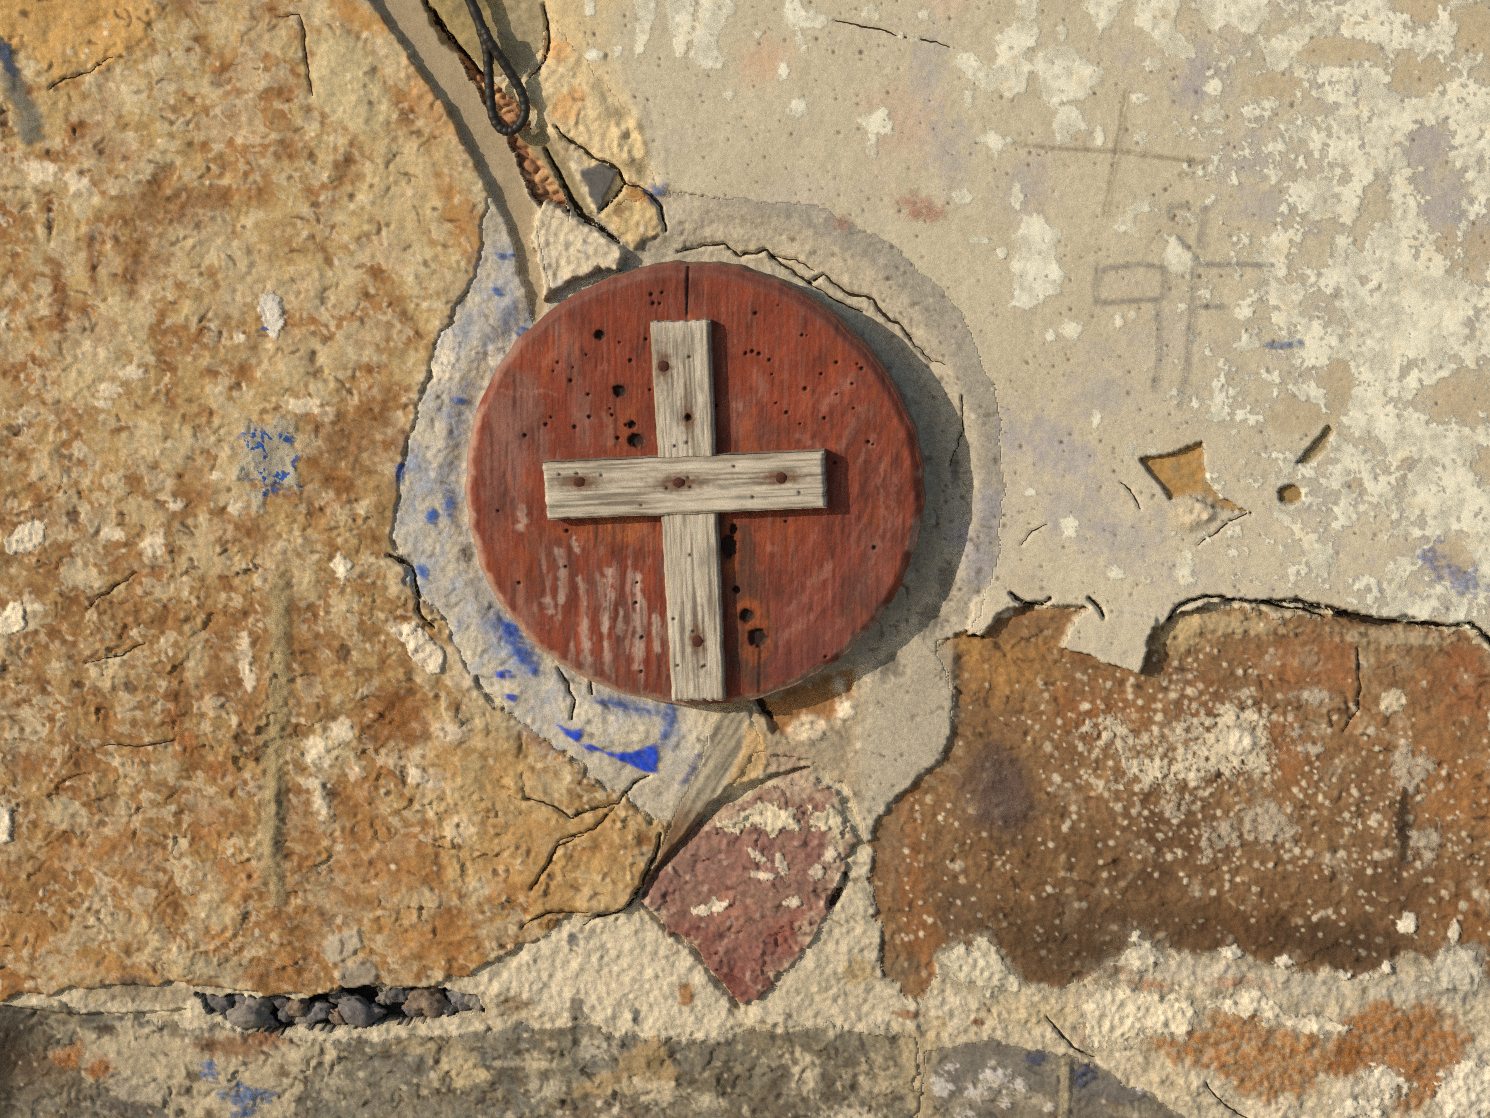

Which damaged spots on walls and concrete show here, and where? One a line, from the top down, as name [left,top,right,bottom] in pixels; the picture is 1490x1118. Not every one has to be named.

peeling [784,0,831,53]
peeling [953,0,1106,149]
peeling [857,107,895,159]
crack [546,126,945,365]
peeling [970,180,1066,311]
peeling [1046,318,1084,342]
peeling [1083,0,1490,634]
crack [950,396,964,466]
crack [522,775,661,929]
peeling [1218,944,1243,960]
peeling [1272,954,1296,970]
peeling [1334,969,1373,981]